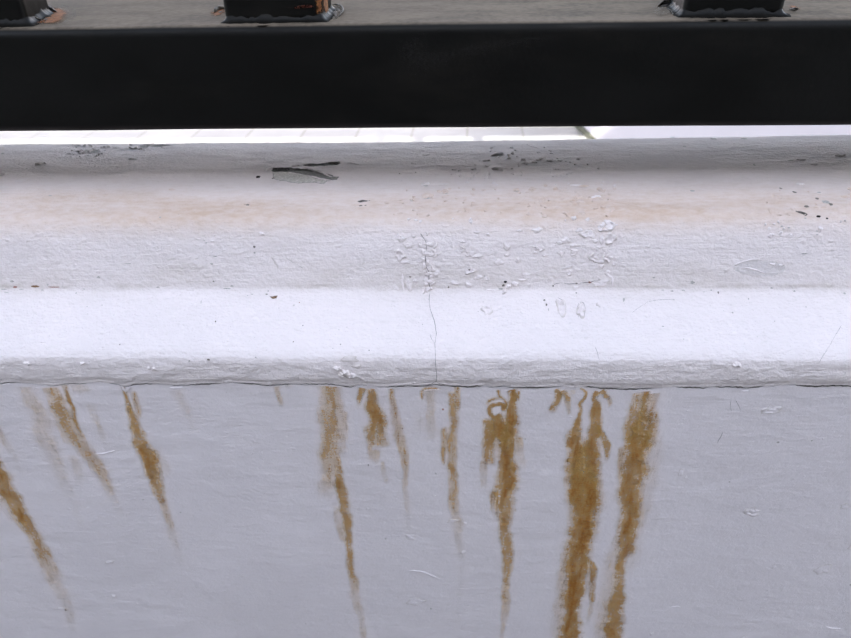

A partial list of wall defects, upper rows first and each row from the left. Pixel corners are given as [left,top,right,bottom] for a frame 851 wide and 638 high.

spalling [256,161,362,184]
crack [389,233,550,388]
rust [0,462,50,563]
rust [124,392,165,503]
crack [240,381,367,389]
rust [321,386,357,582]
rust [357,387,407,466]
rust [484,389,520,598]
rust [559,388,610,638]
rust [604,391,657,638]
crack [673,386,756,408]
crack [796,382,851,390]